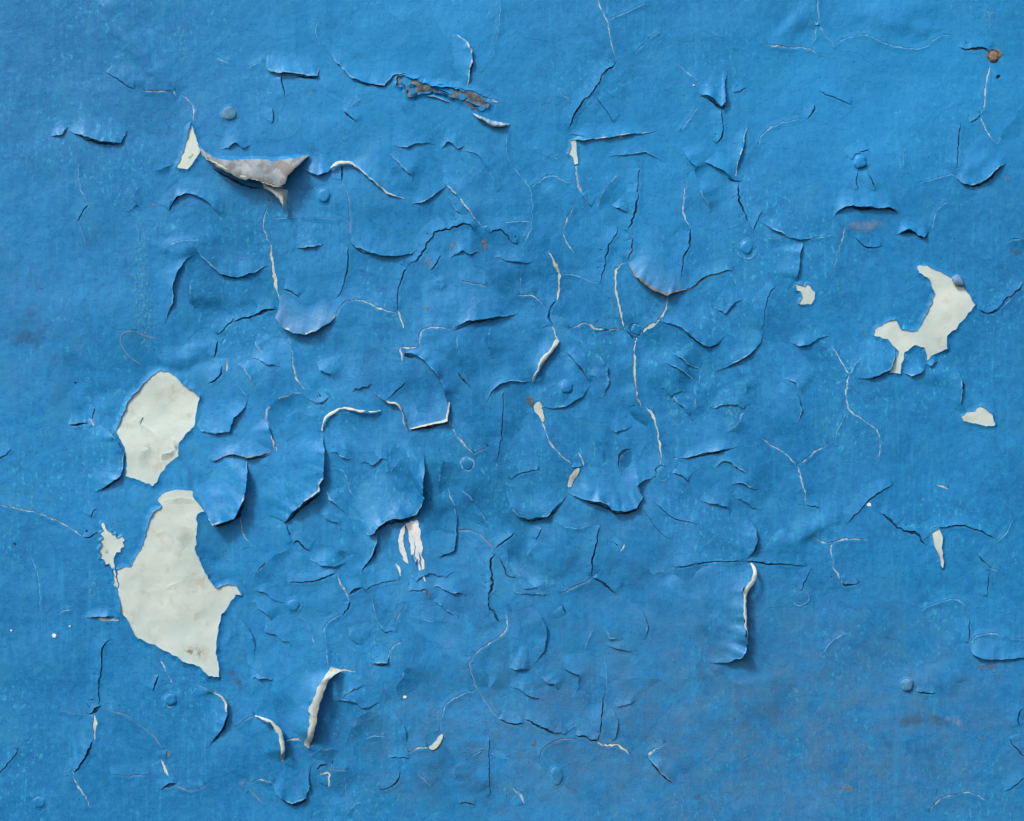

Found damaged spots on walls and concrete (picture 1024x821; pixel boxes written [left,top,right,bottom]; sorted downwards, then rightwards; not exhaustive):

peeling [126,117,533,263]
crack [201,0,1024,644]
peeling [761,213,819,308]
peeling [856,262,978,379]
crack [66,404,99,430]
peeling [943,371,999,431]
peeling [81,278,519,745]
crack [57,631,209,813]
crack [229,517,409,668]
peeling [250,653,425,806]
crack [312,488,635,815]
crack [921,702,1024,811]